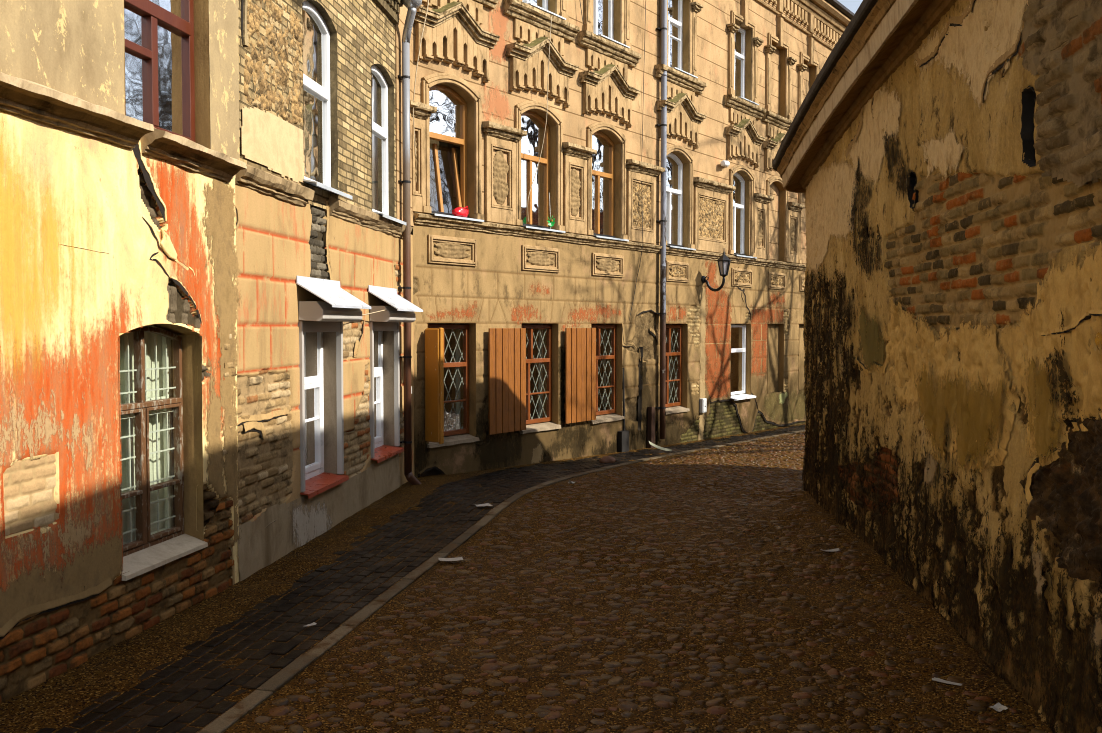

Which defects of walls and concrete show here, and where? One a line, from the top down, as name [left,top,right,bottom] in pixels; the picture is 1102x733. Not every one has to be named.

spalling [244,0,304,127]
crack [132,141,203,324]
leakage [847,157,883,282]
flaking render [885,0,1102,339]
crack [1041,310,1102,336]
peeling [0,137,293,704]
leakage [802,262,1102,733]
spalling [1019,408,1102,593]